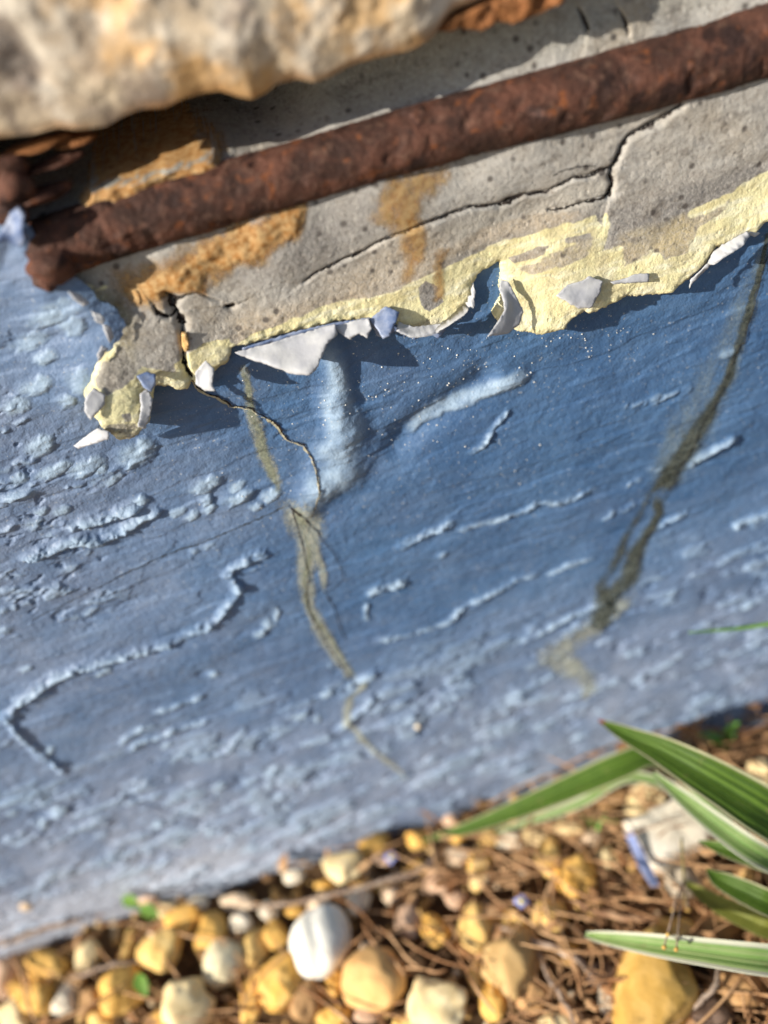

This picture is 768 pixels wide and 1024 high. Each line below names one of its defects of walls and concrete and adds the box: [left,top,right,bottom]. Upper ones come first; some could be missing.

rust [0,0,768,304]
spalling [68,79,768,449]
crack [304,102,682,281]
crack [32,292,354,686]
damp [241,367,280,488]
damp [284,503,404,778]
damp [541,234,768,698]